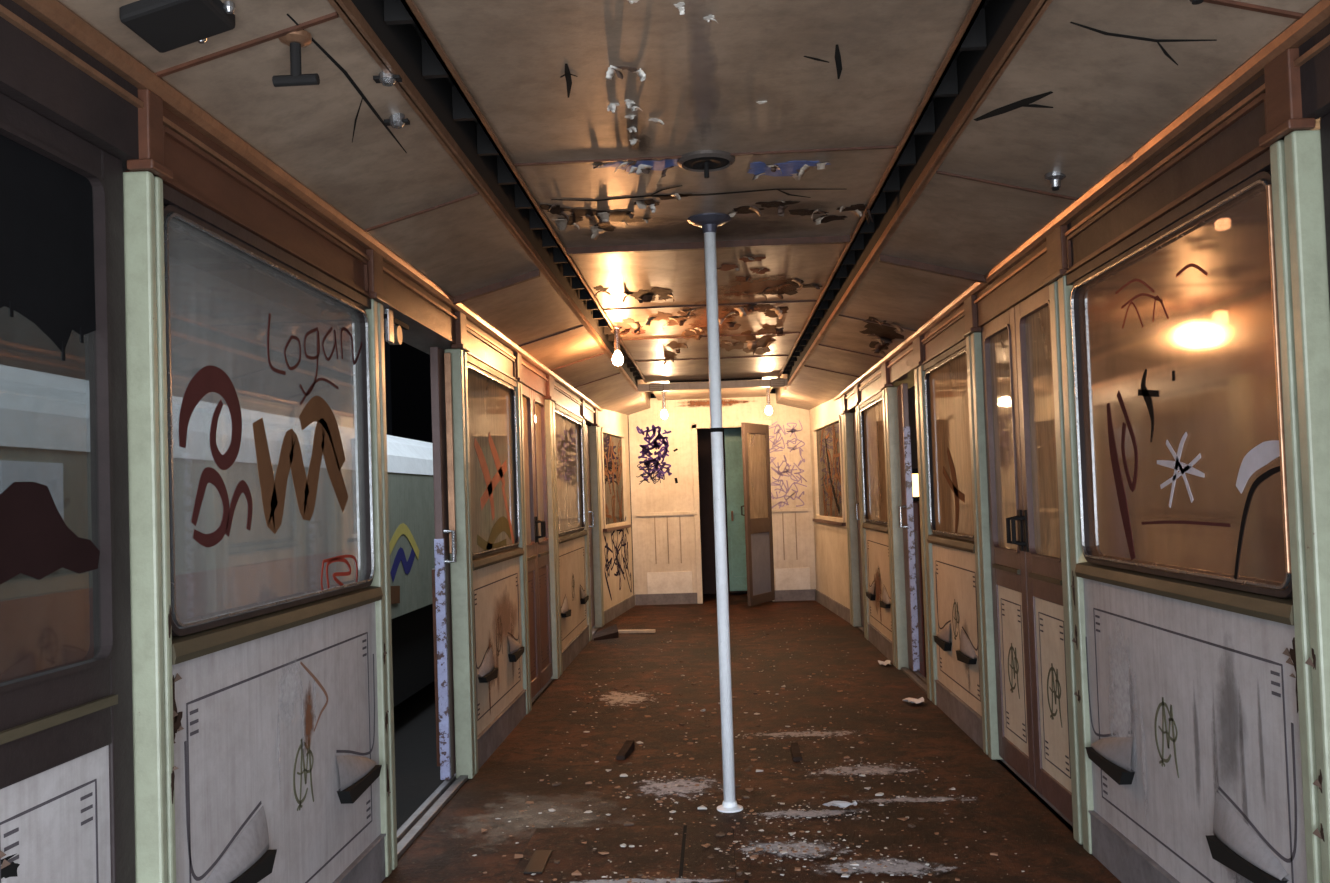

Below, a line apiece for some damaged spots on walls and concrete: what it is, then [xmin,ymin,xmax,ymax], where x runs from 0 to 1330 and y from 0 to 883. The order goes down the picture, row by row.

peeling [747,161,830,181]
peeling [540,193,693,240]
peeling [729,201,874,225]
peeling [594,285,705,365]
peeling [717,256,823,355]